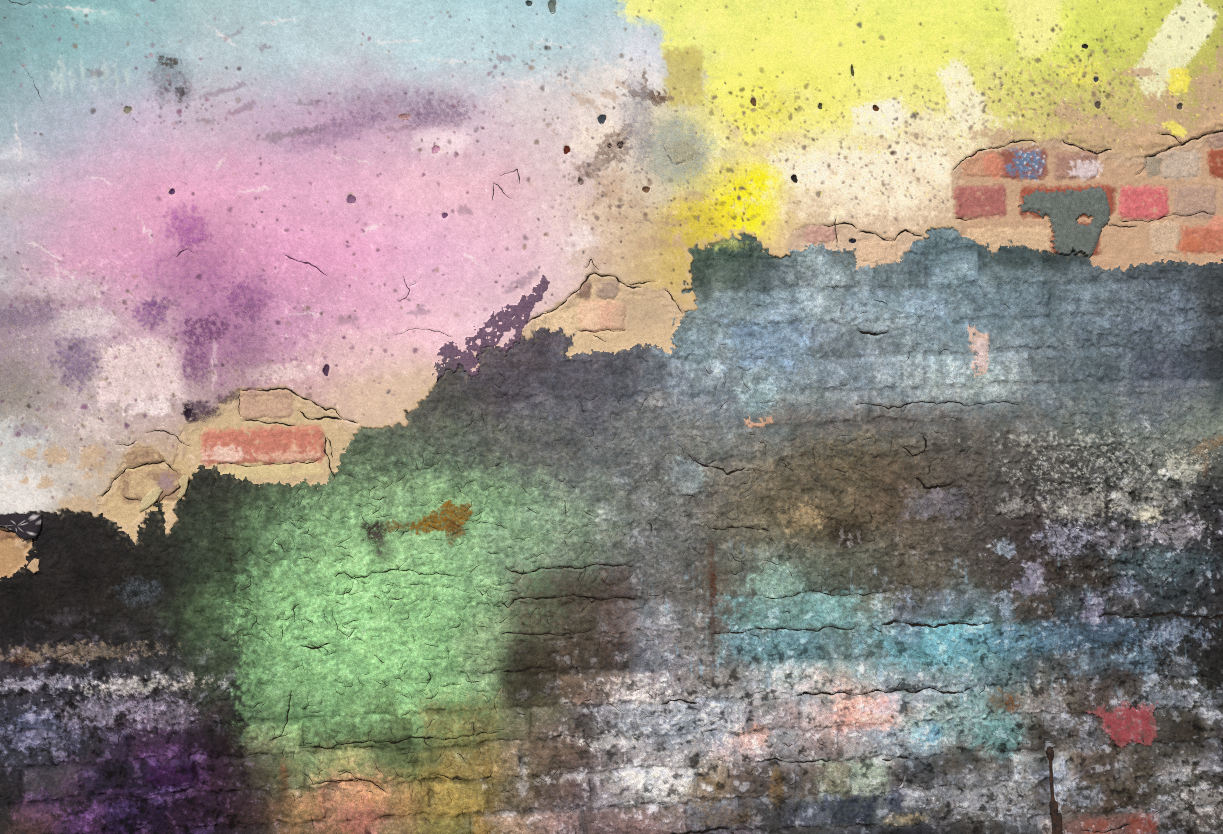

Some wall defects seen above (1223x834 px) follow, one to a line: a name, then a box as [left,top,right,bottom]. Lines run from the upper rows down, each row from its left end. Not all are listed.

spalling [951,130,1223,272]
spalling [432,271,687,383]
spalling [97,386,359,545]
spalling [0,513,42,578]
rust [386,500,473,544]
rust [1046,746,1063,834]